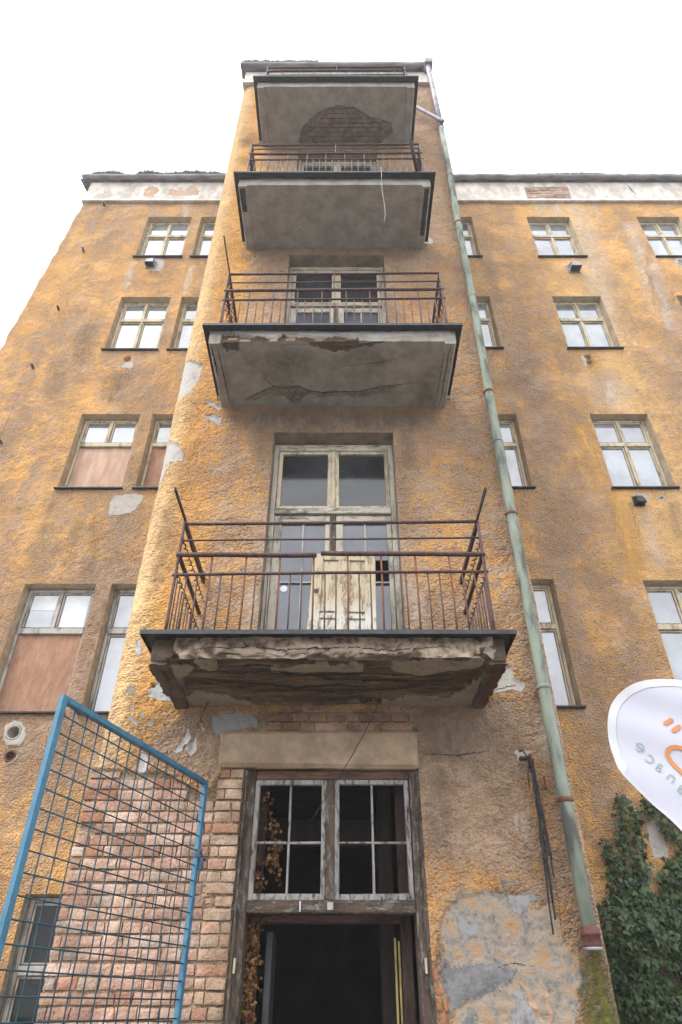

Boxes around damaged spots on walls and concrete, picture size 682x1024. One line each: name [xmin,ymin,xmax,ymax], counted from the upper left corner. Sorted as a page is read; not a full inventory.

flaking render [299,105,393,144]
flaking render [524,186,572,199]
peeling [221,331,451,352]
flaking render [177,360,203,400]
crack [211,347,451,404]
flaking render [157,441,184,492]
flaking render [108,493,143,515]
spalling [126,639,525,757]
flaking render [434,878,591,1024]